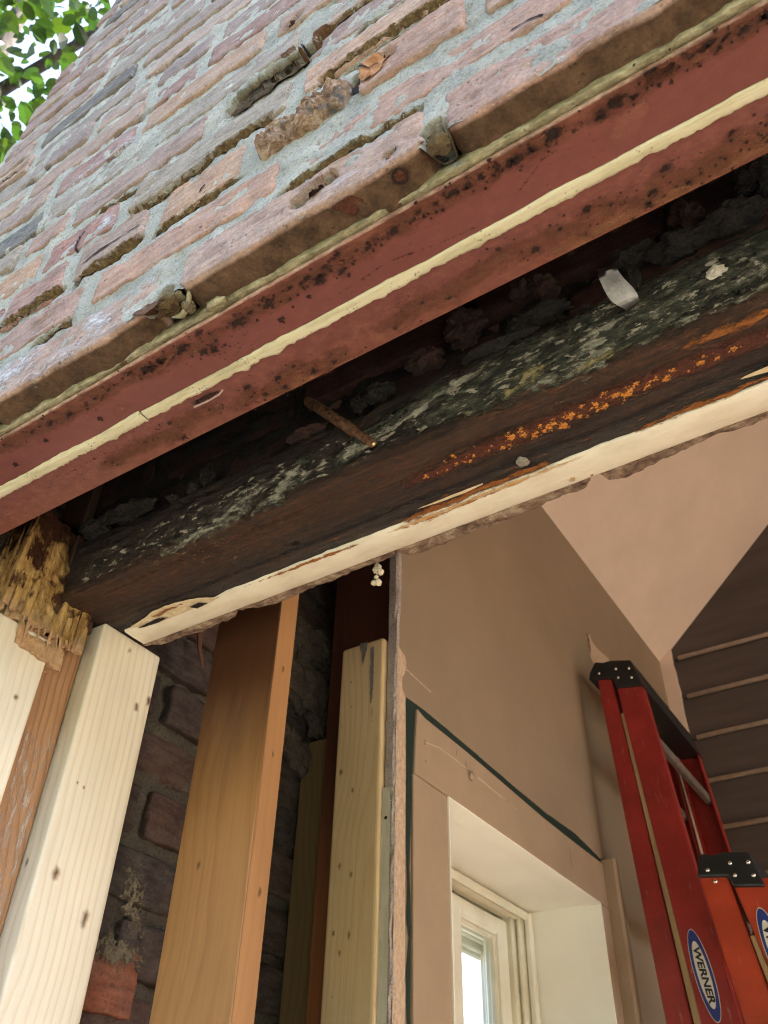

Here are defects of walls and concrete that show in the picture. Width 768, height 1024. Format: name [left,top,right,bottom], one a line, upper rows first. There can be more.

spalling [254,52,390,161]
spalling [132,290,196,319]
corrosion [0,8,768,453]
peeling [193,389,224,408]
damp [83,226,768,583]
corrosion [400,309,768,488]
spalling [130,411,768,1024]